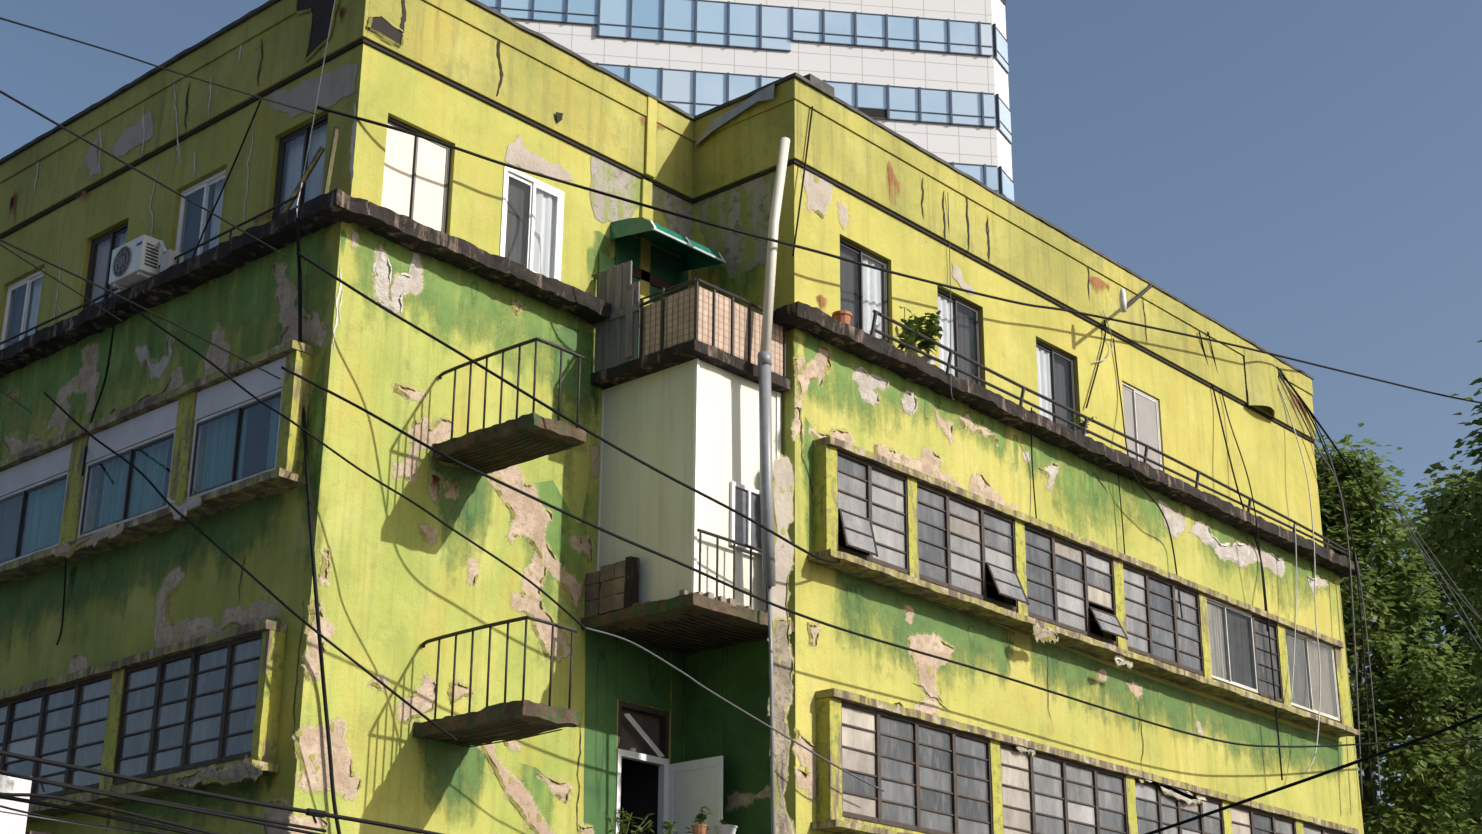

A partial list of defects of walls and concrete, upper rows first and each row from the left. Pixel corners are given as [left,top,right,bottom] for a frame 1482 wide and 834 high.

peeling [267,0,358,118]
peeling [273,262,327,348]
peeling [350,231,424,313]
peeling [504,135,573,181]
peeling [590,155,776,278]
corrosion [887,162,899,192]
peeling [791,345,854,445]
peeling [852,367,1018,511]
peeling [487,465,584,662]
peeling [1158,500,1285,578]
spalling [726,455,821,834]
peeling [904,605,954,716]